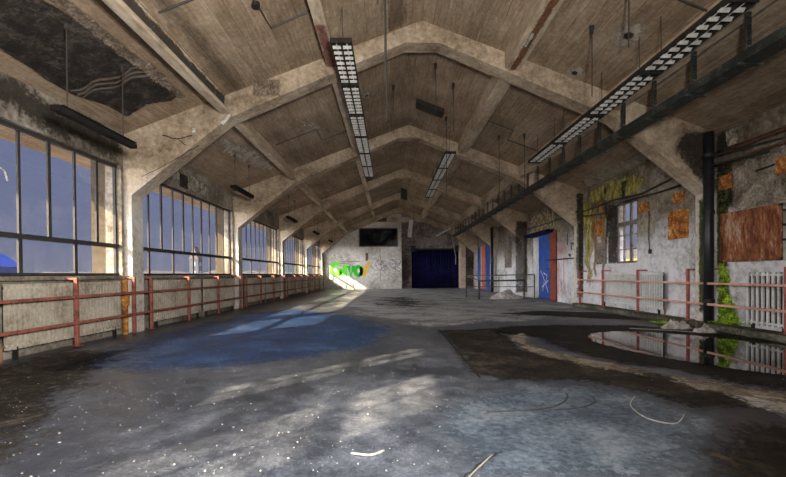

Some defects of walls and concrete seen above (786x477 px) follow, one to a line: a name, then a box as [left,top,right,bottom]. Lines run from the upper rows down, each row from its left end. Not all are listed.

flaking render [0,0,185,116]
peeling [315,25,335,67]